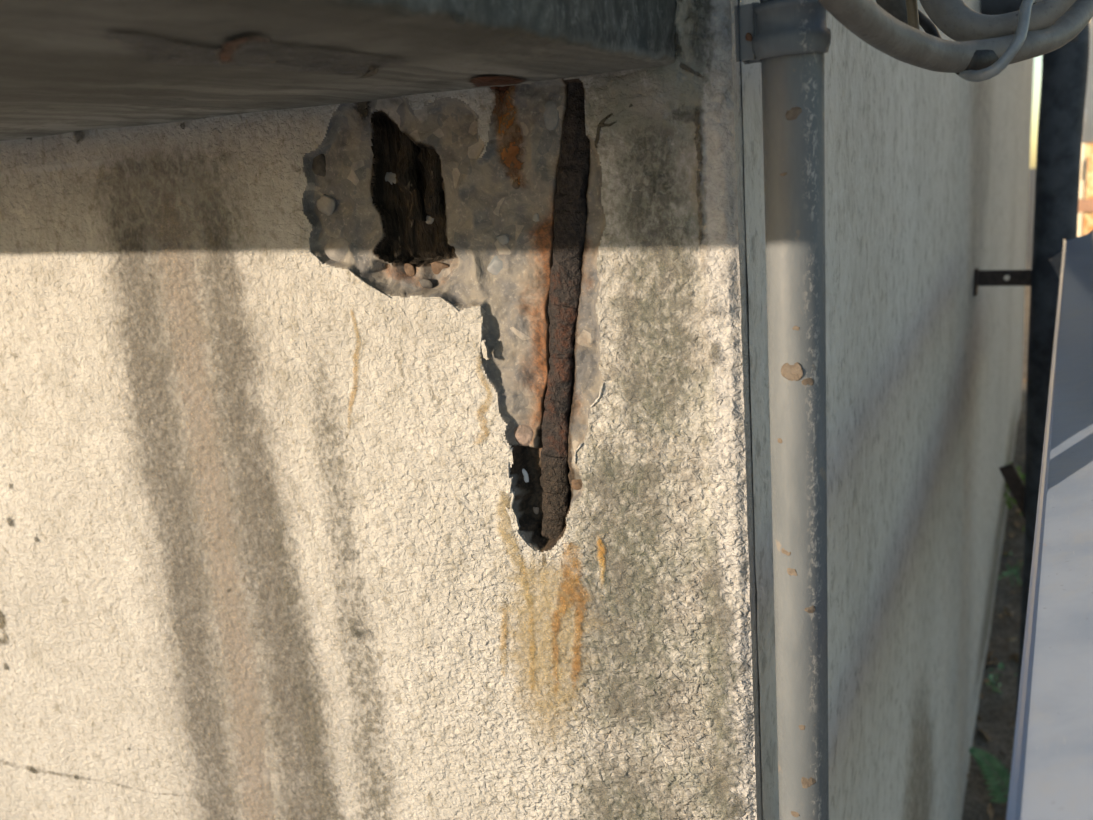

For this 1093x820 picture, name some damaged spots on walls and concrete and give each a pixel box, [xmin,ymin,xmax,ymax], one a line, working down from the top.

water stain [119,228,233,820]
water stain [209,229,340,820]
water stain [317,403,390,820]
spalling [302,78,606,553]
rust [469,76,527,186]
rust [511,545,586,727]
rust [597,540,605,579]